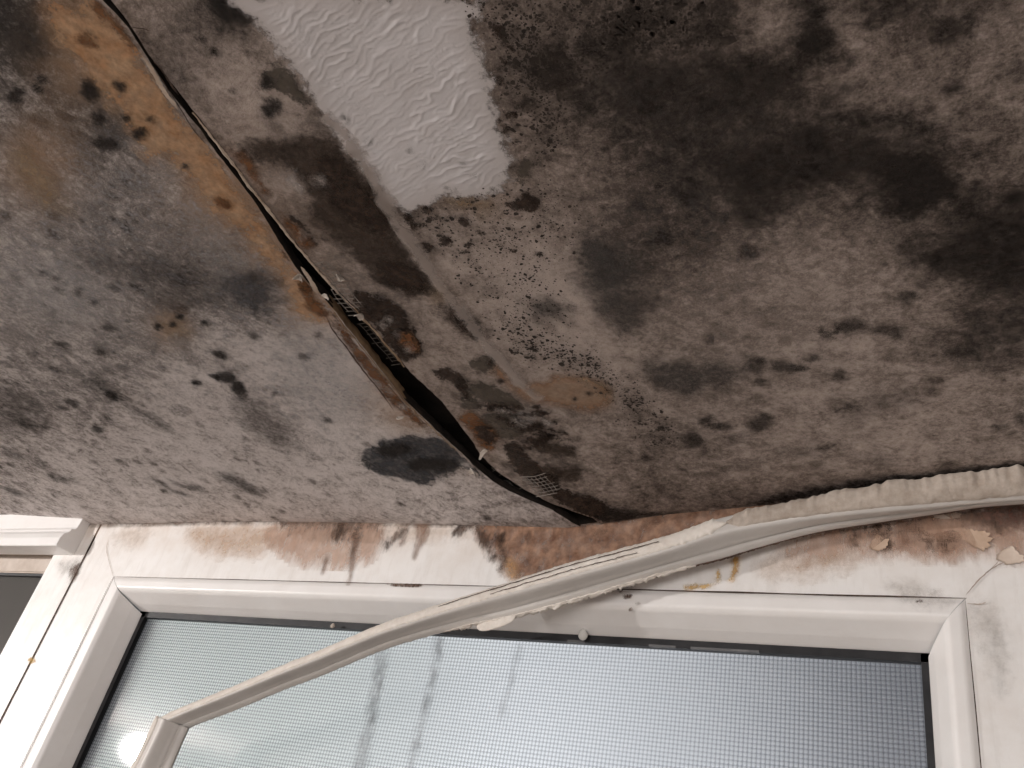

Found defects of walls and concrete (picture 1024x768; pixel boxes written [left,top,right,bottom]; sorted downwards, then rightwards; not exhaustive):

water stain [6,76,46,103]
water stain [48,0,328,337]
crack [103,0,597,526]
water stain [238,0,958,523]
water stain [191,351,277,441]
water stain [223,474,258,493]
water stain [742,462,1024,507]
water stain [103,521,472,577]
water stain [685,557,738,589]
peeling [869,535,889,551]
water stain [786,505,1024,558]
peeling [934,513,1024,565]